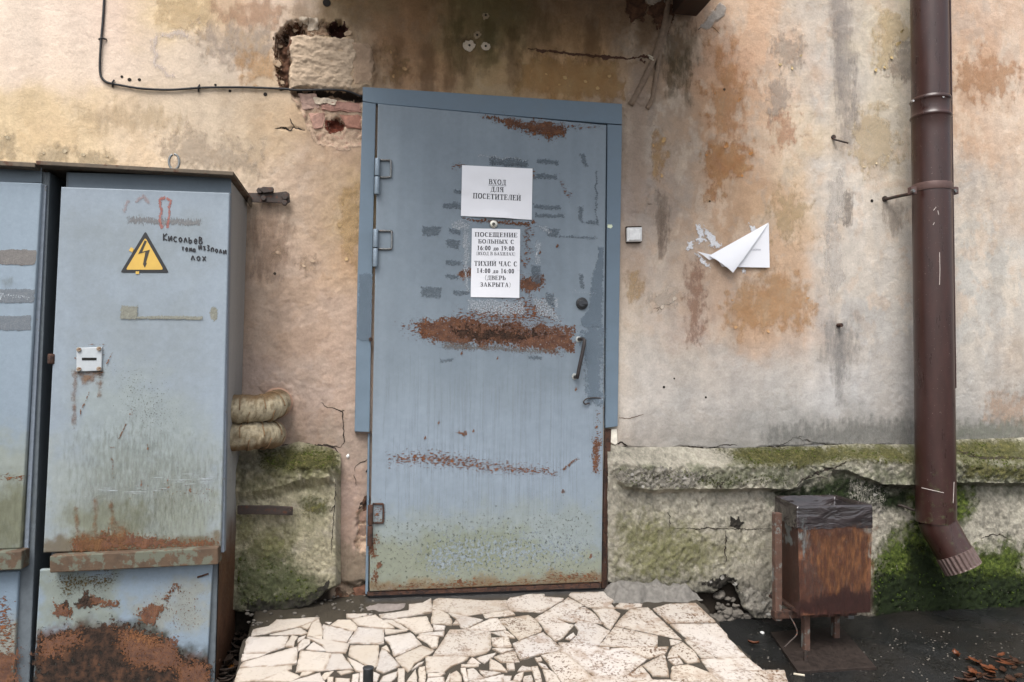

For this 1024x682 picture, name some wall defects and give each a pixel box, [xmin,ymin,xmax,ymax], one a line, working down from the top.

flaking render [199,3,363,151]
rust [479,111,596,142]
rust [395,217,576,359]
crack [285,404,367,550]
rust [386,408,603,477]
crack [680,436,853,486]
spalling [701,574,772,618]